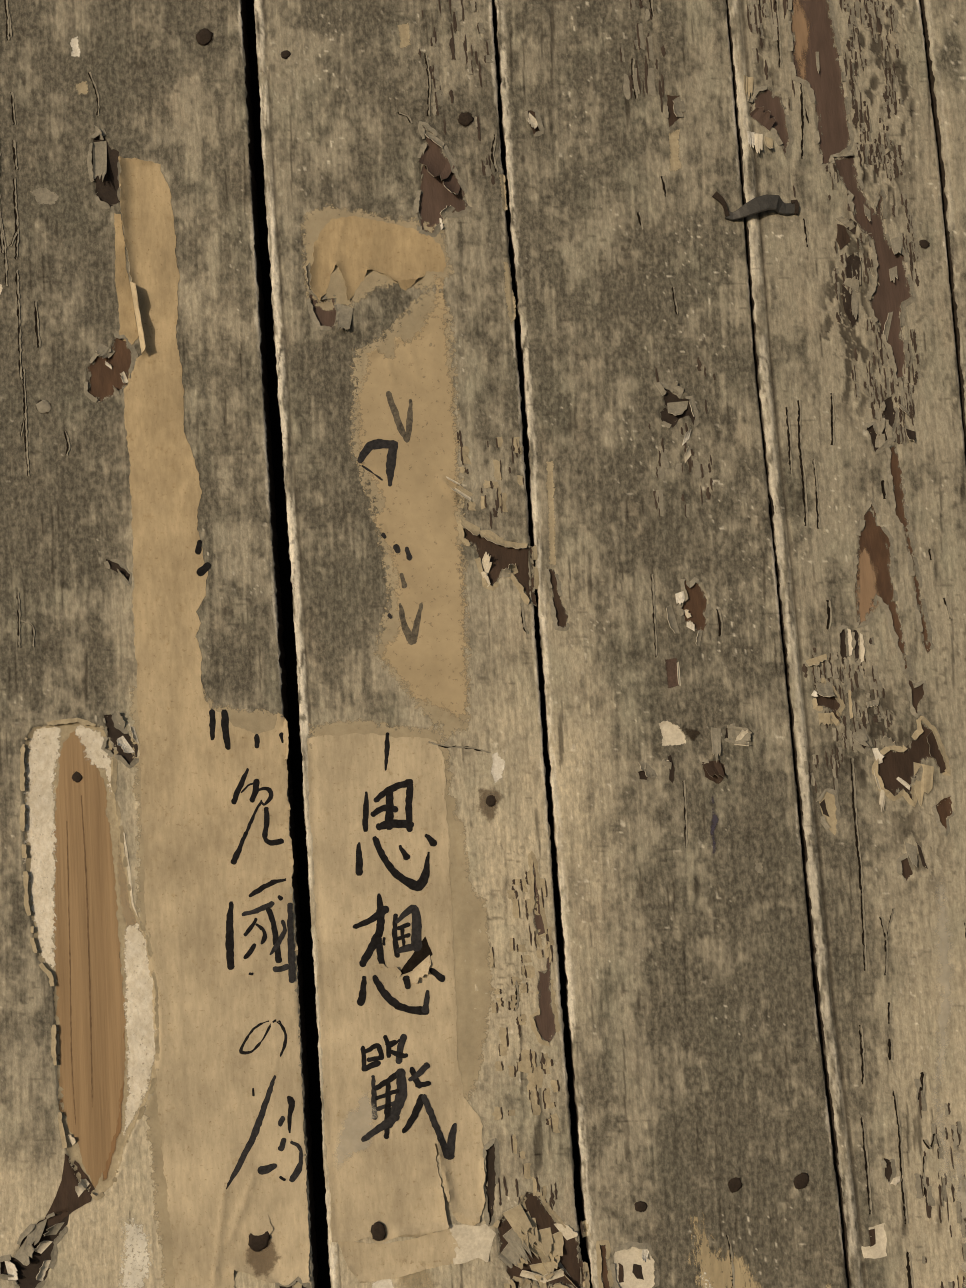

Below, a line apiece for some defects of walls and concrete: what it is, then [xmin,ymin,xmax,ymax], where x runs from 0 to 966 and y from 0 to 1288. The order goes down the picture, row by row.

peeling [397,0,494,237]
peeling [474,116,508,211]
peeling [83,333,138,403]
peeling [744,0,954,837]
peeling [446,430,570,631]
peeling [666,577,710,646]
peeling [897,842,928,881]
peeling [0,710,160,1288]
peeling [491,851,560,1133]
peeling [483,1134,660,1288]